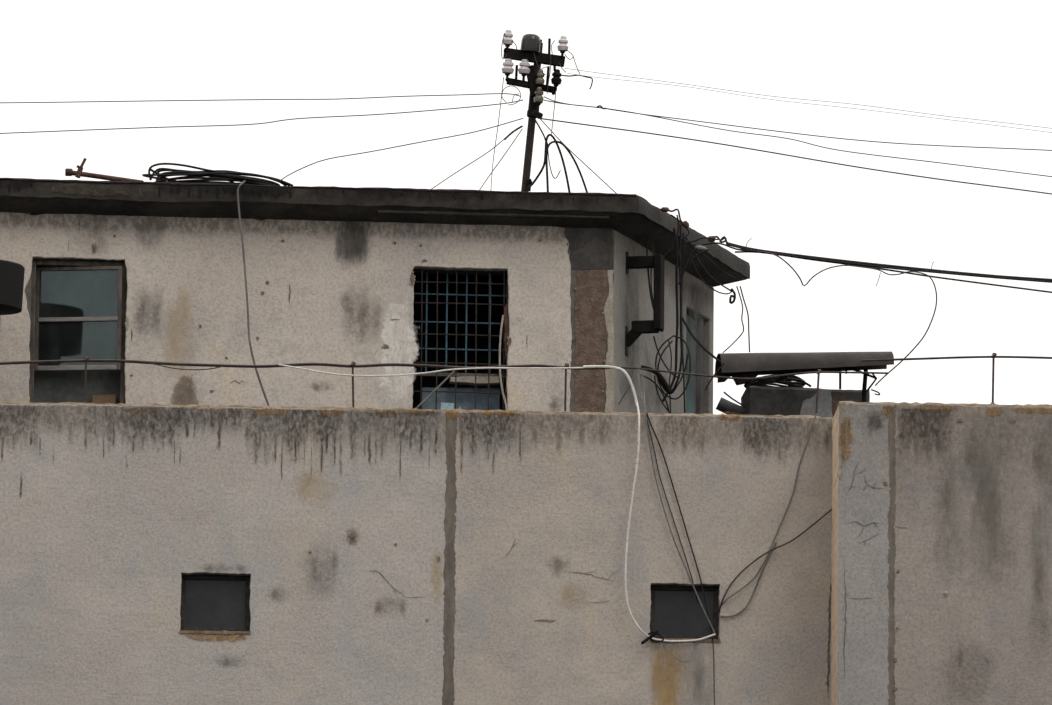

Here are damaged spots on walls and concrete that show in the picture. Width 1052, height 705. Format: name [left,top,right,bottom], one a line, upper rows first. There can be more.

leakage [340,221,366,258]
leakage [0,405,53,458]
leakage [95,376,521,476]
leakage [738,415,824,452]
leakage [899,407,950,442]